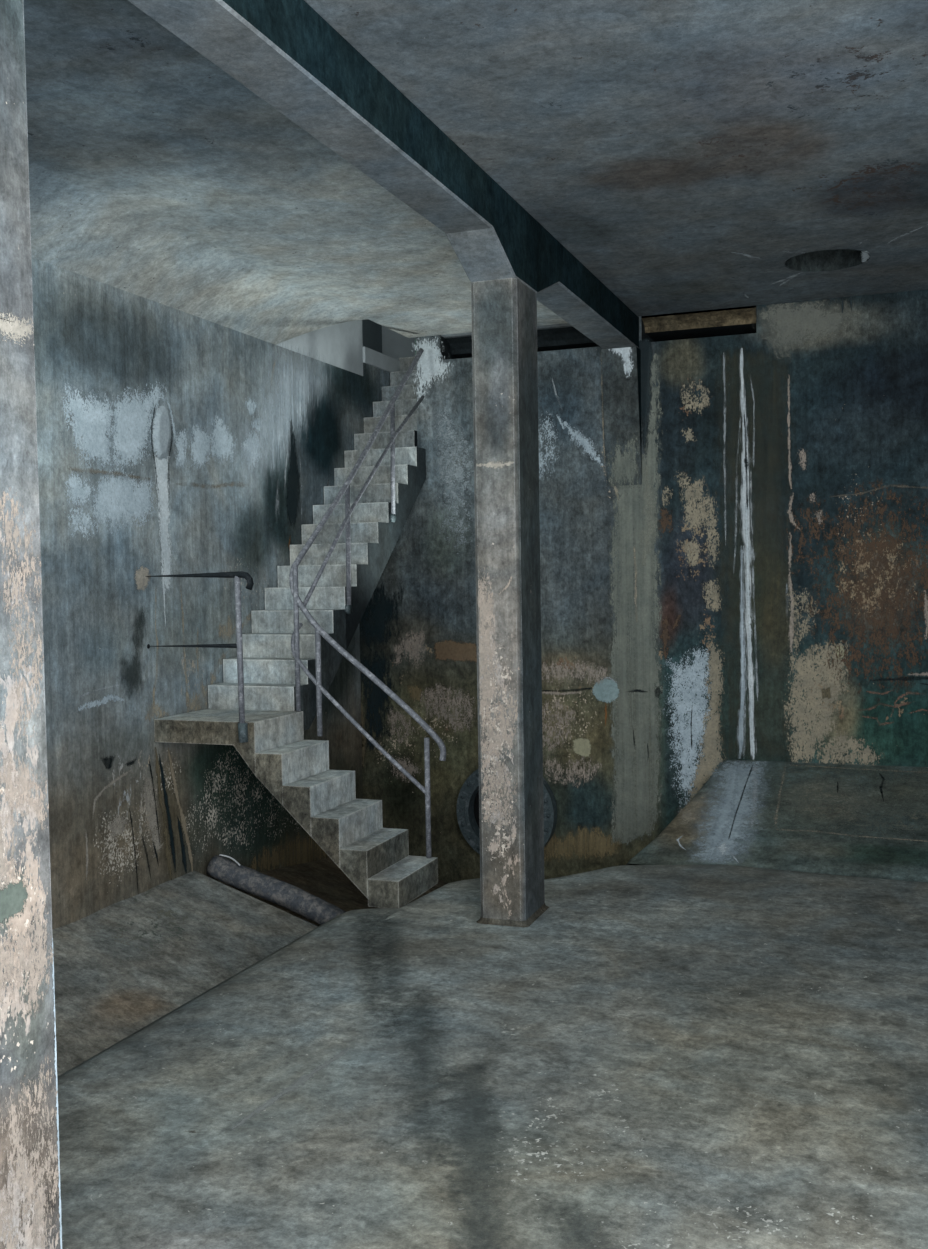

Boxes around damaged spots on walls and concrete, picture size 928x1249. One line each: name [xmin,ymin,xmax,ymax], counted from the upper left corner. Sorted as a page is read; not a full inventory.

peeling [0,488,45,738]
peeling [60,378,170,541]
damp [245,348,331,528]
peeling [662,470,724,612]
peeling [681,381,710,443]
peeling [782,377,881,766]
peeling [0,753,53,1016]
peeling [93,755,164,857]
peeling [0,1057,59,1249]